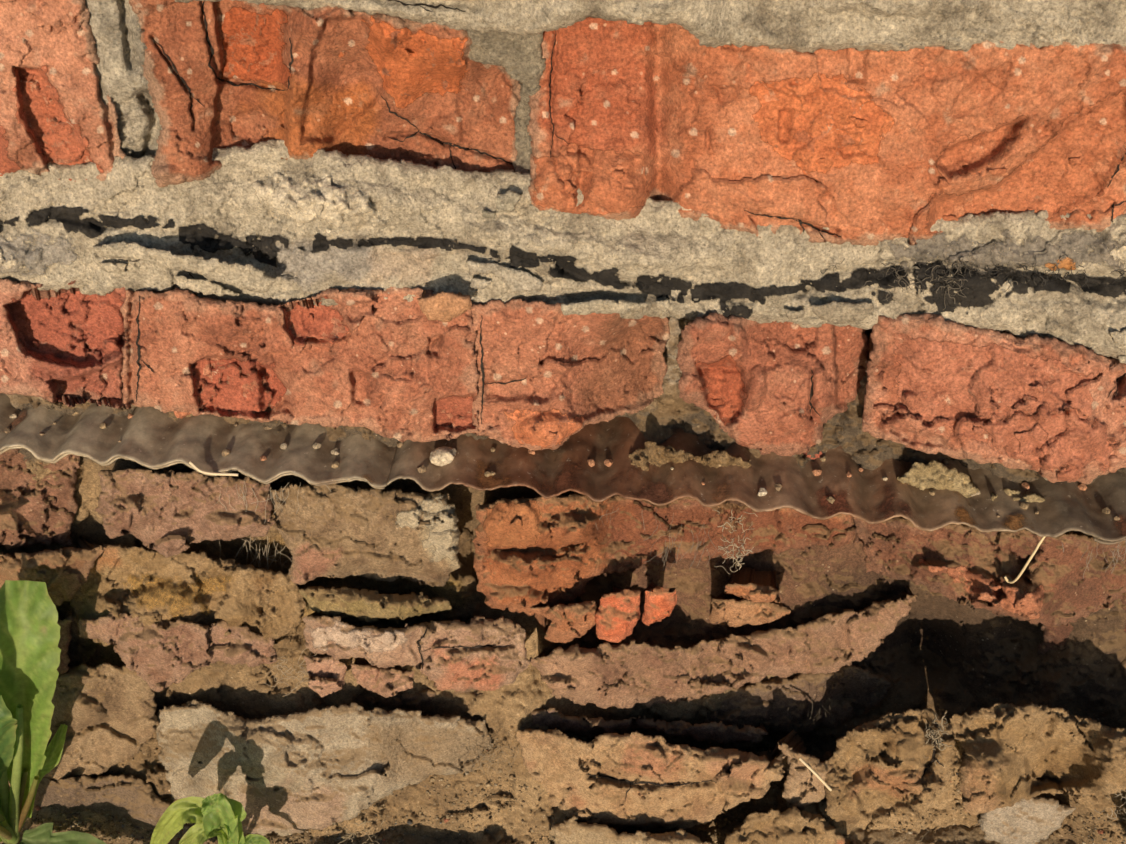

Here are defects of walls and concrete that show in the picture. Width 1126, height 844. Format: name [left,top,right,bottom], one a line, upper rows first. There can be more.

crack [388,0,465,12]
crack [202,1,293,91]
crack [152,38,205,126]
spalling [924,91,1126,236]
crack [1108,153,1126,223]
crack [744,210,841,239]
spalling [3,283,126,369]
peeling [561,299,670,316]
spalling [192,358,287,419]
spalling [891,333,1094,452]
rust [817,489,853,517]
rust [876,486,911,520]